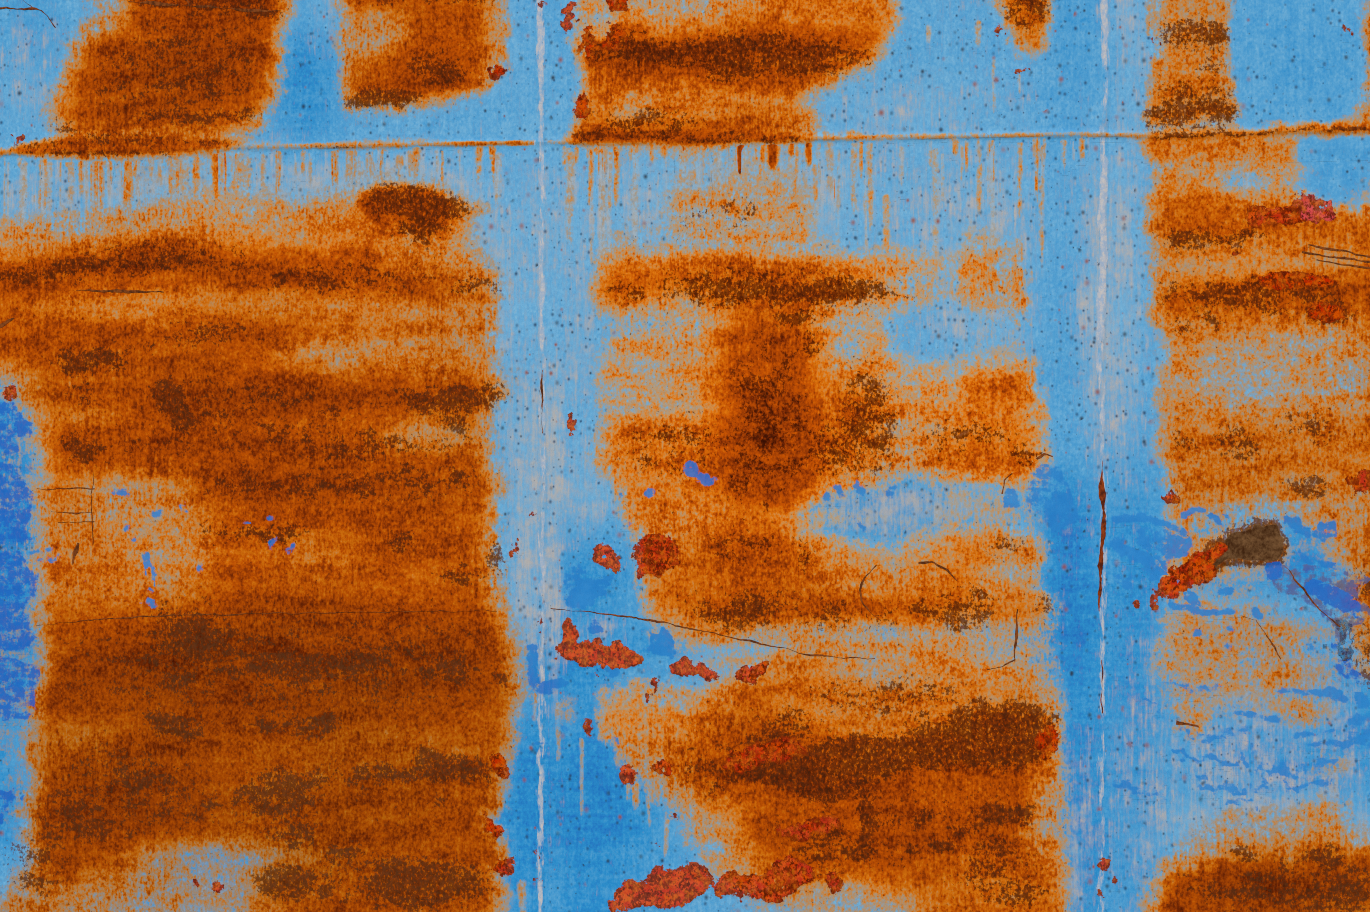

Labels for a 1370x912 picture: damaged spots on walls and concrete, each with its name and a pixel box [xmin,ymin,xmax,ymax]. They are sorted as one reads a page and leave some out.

peeling [534,0,549,21]
corrosion [0,0,1089,912]
corrosion [553,0,1370,912]
peeling [589,529,686,583]
peeling [531,605,774,706]
peeling [616,752,676,790]
peeling [525,845,550,886]
peeling [600,808,804,912]